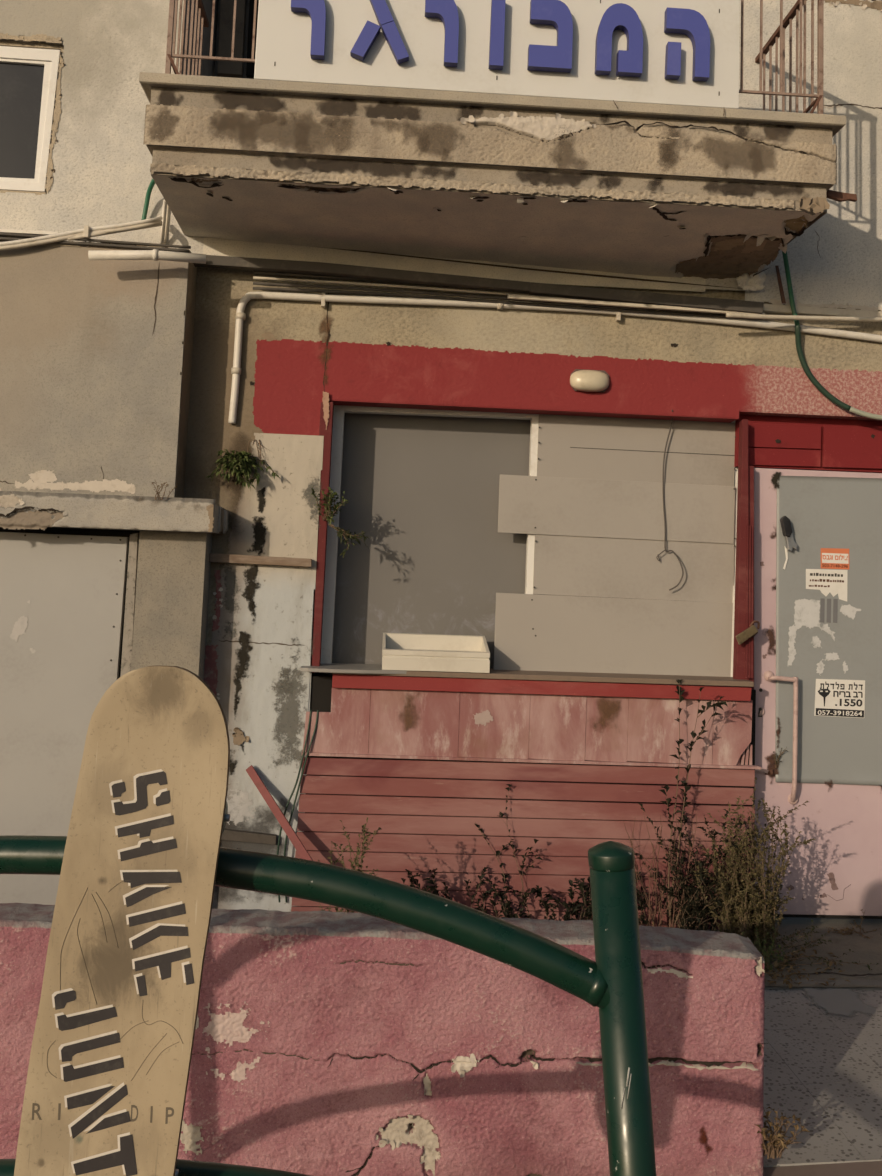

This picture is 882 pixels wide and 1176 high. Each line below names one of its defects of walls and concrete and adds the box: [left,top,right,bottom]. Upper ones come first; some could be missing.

leakage [153,89,183,139]
leakage [214,91,483,178]
spalling [460,111,597,144]
crack [597,100,812,155]
spalling [675,196,830,279]
peeling [0,470,136,518]
leakage [224,487,268,714]
leakage [273,639,312,765]
crack [192,1049,602,1080]
crack [648,1057,758,1071]
crack [345,1146,379,1176]
spalling [376,1114,441,1176]